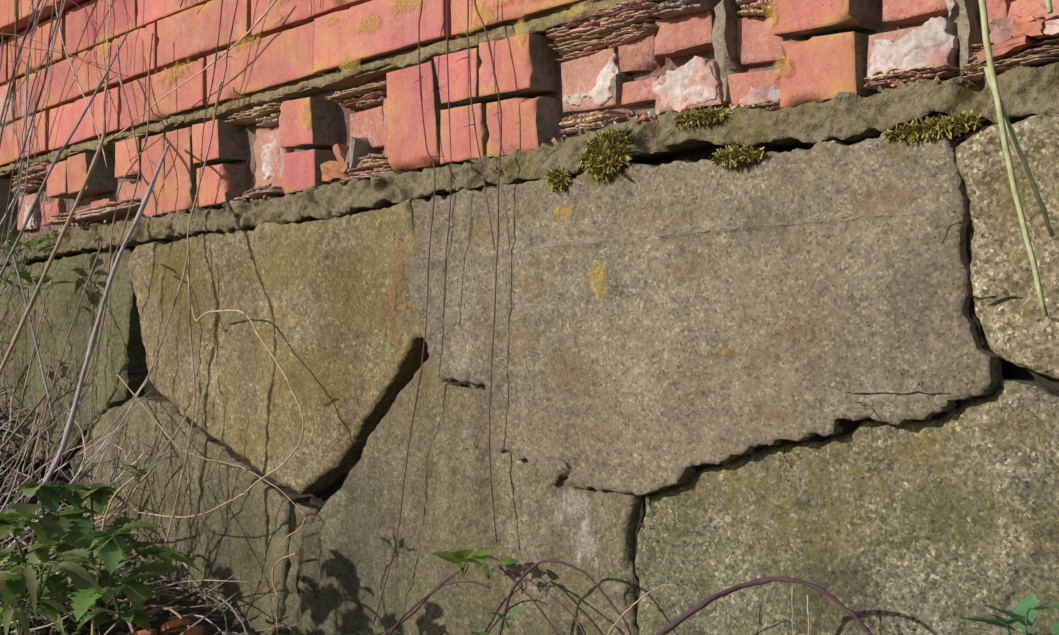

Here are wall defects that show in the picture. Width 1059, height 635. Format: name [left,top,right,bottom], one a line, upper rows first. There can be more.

spalling [224,103,282,128]
spalling [326,81,387,111]
leakage [563,53,626,106]
leakage [652,56,722,115]
leakage [738,83,780,107]
leakage [867,0,960,78]
spalling [864,37,1059,92]
spalling [338,153,400,182]
crack [943,220,972,265]
crack [441,380,482,389]
crack [693,294,1059,472]
crack [623,486,672,606]